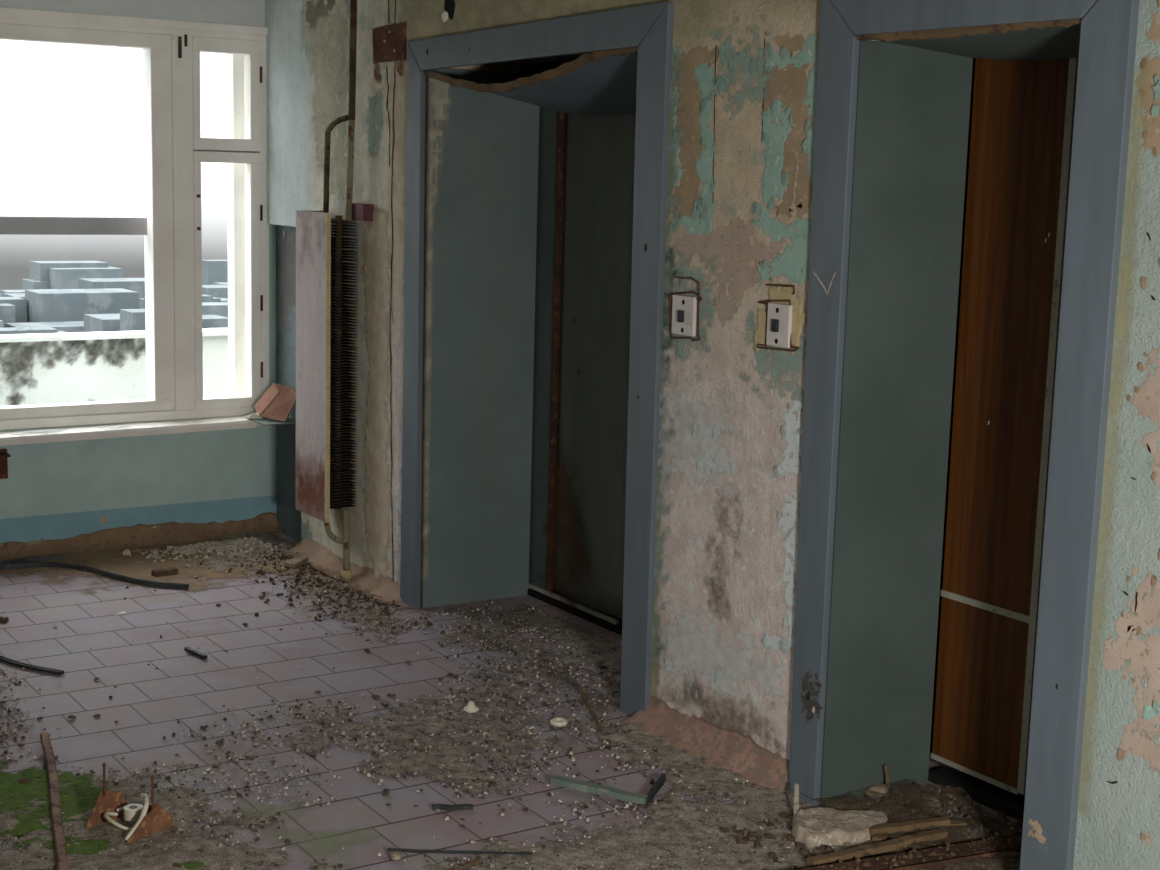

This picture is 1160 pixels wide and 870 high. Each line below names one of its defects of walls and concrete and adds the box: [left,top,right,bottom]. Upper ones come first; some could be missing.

spalling [666,15,819,287]
rust [546,111,575,590]
damp [684,679,780,748]
spalling [801,671,823,724]
peeling [1101,559,1160,793]